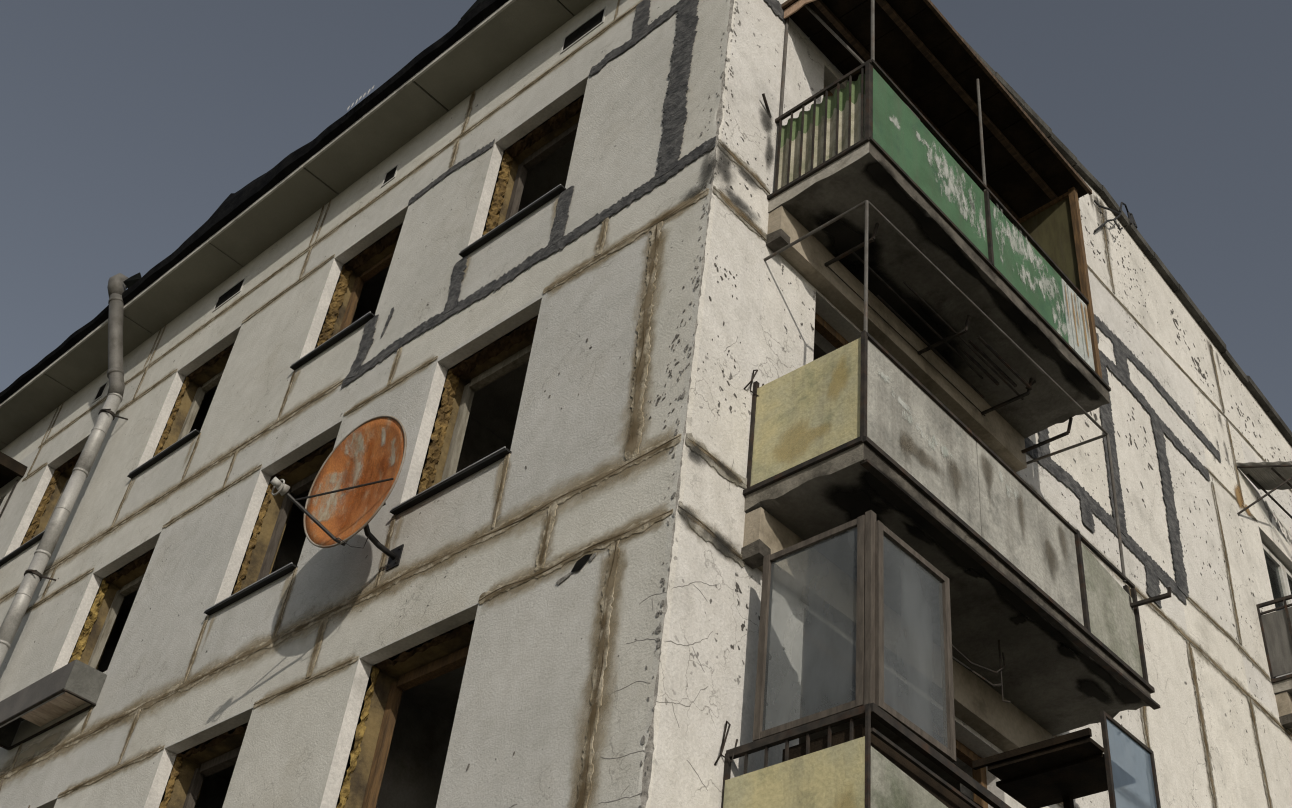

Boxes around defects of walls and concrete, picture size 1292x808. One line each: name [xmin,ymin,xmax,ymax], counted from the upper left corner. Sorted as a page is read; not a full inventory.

water stain [117,0,636,414]
water stain [0,147,757,808]
crack [0,190,767,805]
water stain [762,110,774,163]
spalling [1078,198,1214,392]